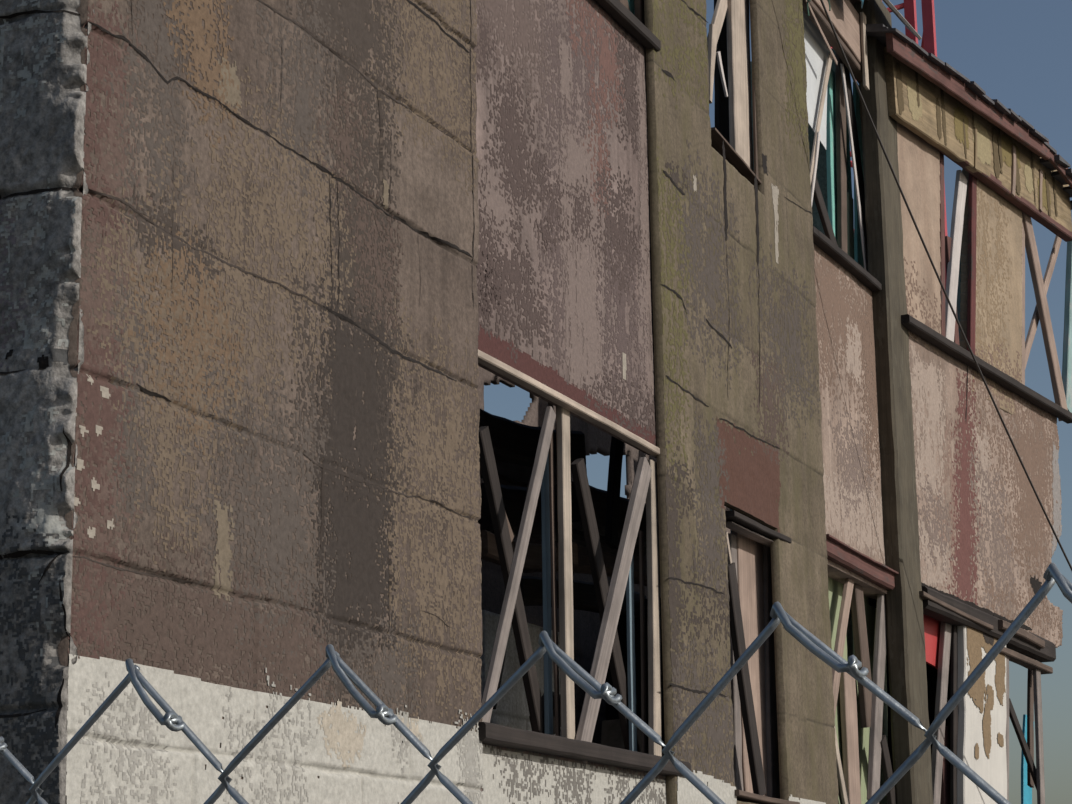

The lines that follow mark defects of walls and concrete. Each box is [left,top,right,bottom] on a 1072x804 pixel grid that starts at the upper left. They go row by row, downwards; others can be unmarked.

crack [60,428,72,491]
crack [137,384,171,402]
leakage [180,0,427,804]
leakage [473,0,735,784]
rust [936,369,983,605]
spalling [1052,444,1062,556]
crack [0,549,193,728]
peeling [317,699,366,770]
peeling [967,626,1006,760]
spalling [1030,576,1046,599]